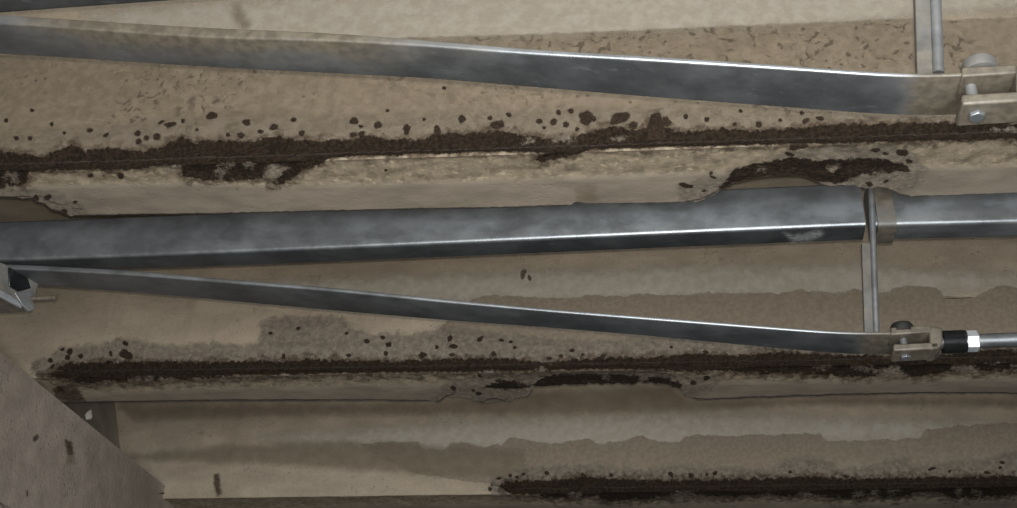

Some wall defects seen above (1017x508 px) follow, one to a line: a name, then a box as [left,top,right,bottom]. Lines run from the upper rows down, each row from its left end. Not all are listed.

spalling [0,108,1017,215]
spalling [32,316,1017,403]
damp [439,320,680,346]
damp [277,263,864,332]
damp [696,340,816,355]
damp [877,268,1017,334]